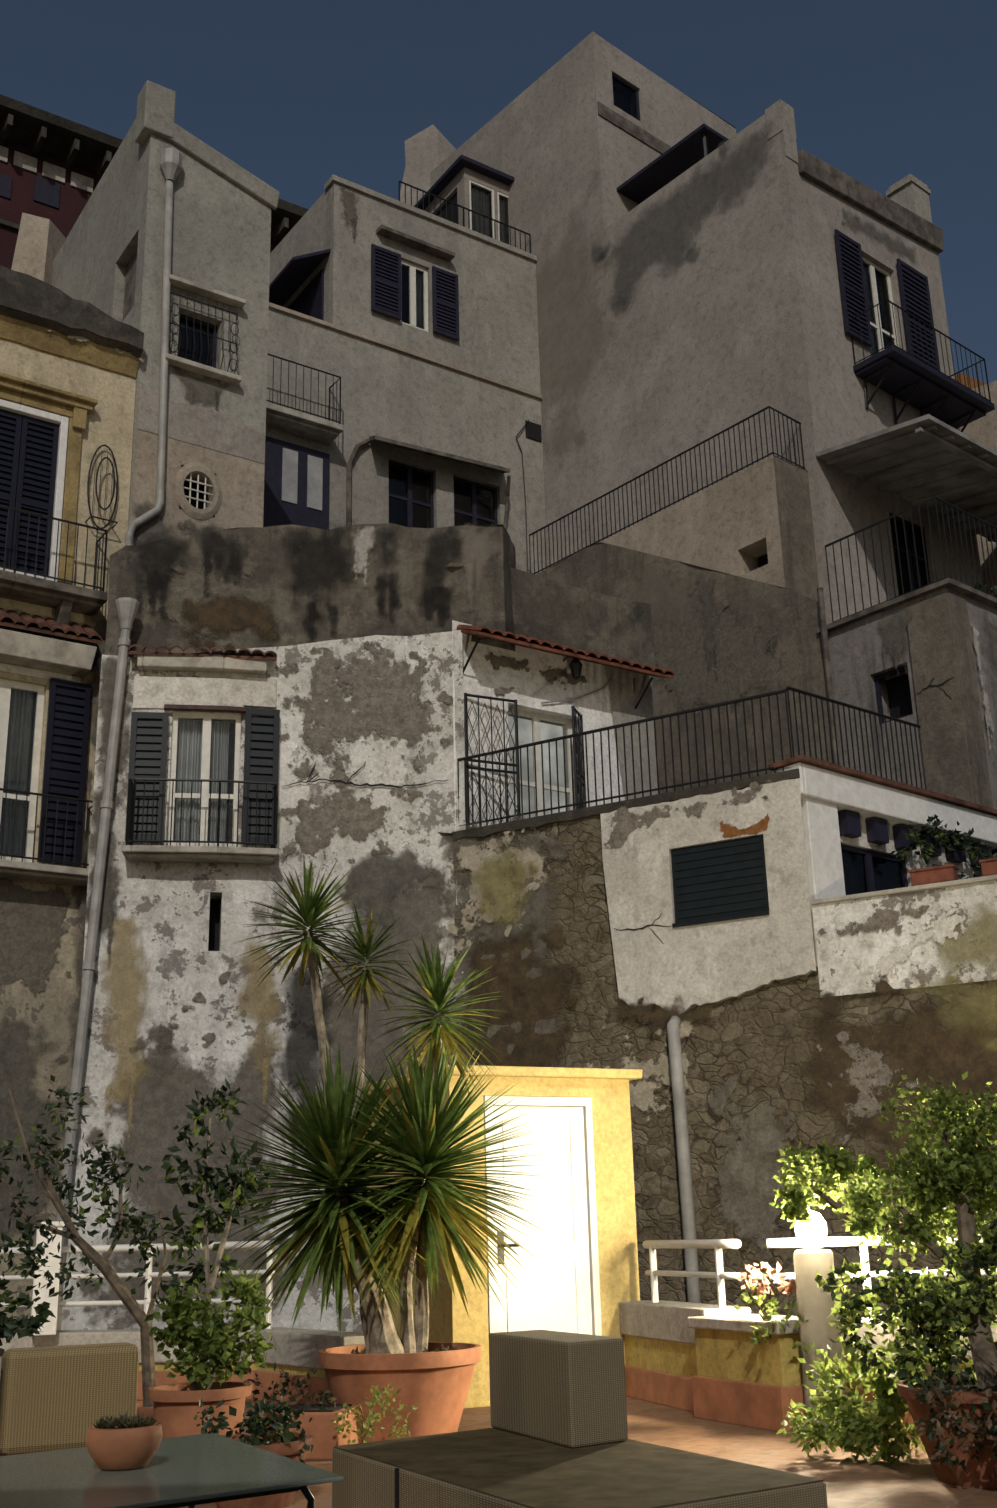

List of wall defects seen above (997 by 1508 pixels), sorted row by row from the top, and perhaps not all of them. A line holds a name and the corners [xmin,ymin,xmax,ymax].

water stain [536,134,765,392]
water stain [134,503,241,616]
water stain [284,527,401,643]
water stain [419,531,498,625]
flaking render [278,641,453,862]
crack [282,761,449,788]
flaking render [597,780,771,849]
peeling [0,878,74,996]
peeling [319,815,567,1088]
flaking render [818,899,967,976]
peeling [0,1021,68,1237]
peeling [79,992,289,1324]